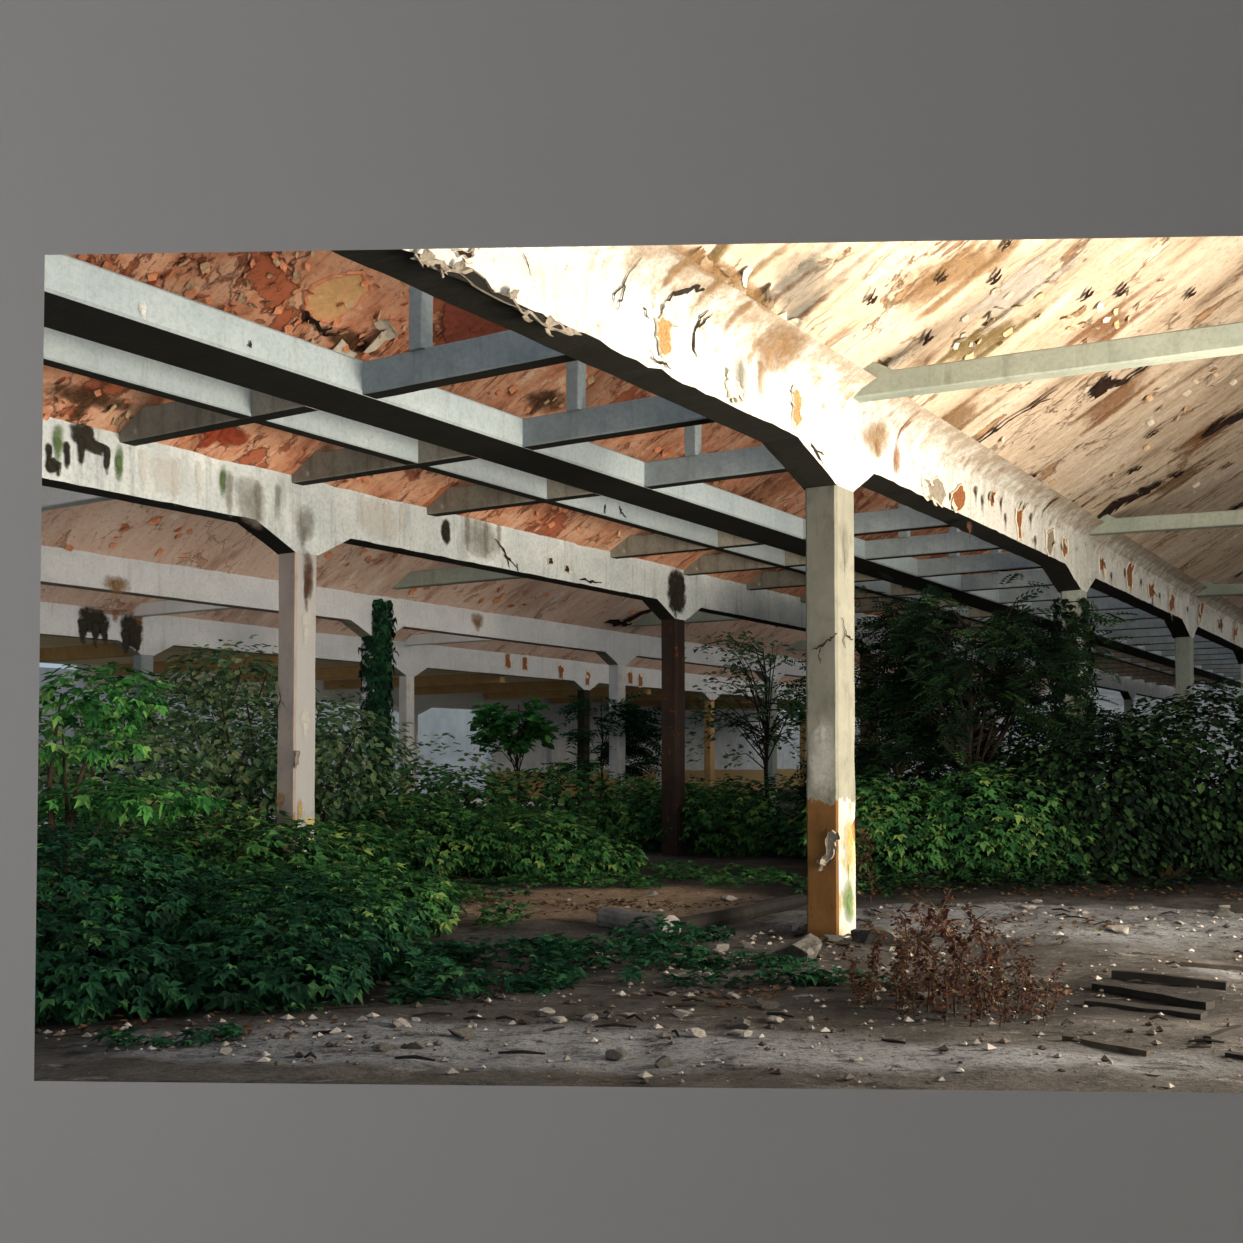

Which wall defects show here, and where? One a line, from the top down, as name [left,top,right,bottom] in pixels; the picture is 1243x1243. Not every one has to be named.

spalling [410,248,582,343]
crack [613,258,713,369]
water stain [903,240,1018,317]
water stain [940,261,1061,363]
water stain [1067,293,1153,346]
water stain [46,385,130,478]
water stain [864,424,887,455]
water stain [943,390,999,431]
water stain [1077,367,1155,431]
water stain [668,570,686,620]
water stain [78,607,143,654]
spalling [816,824,854,872]